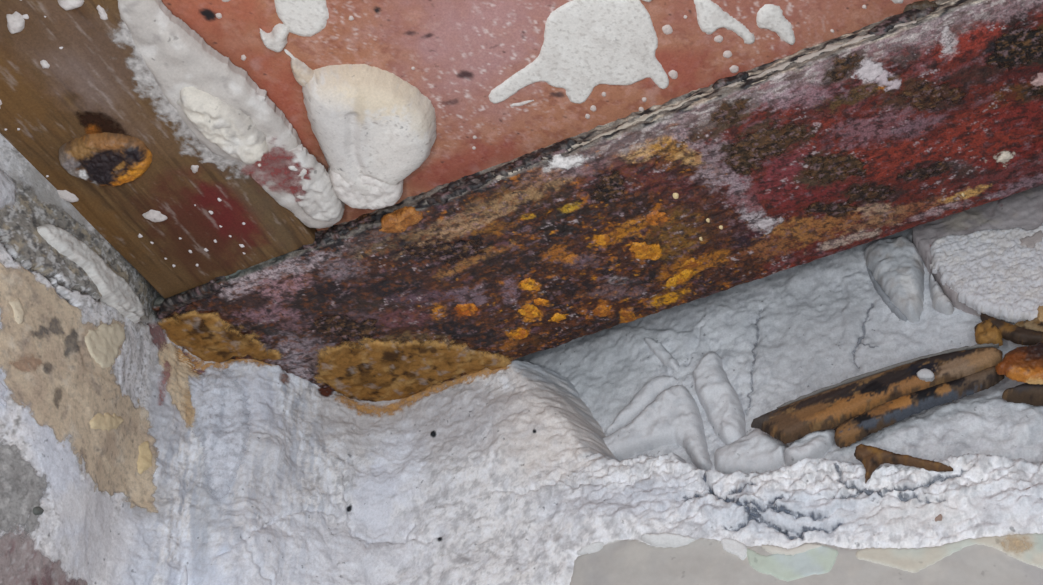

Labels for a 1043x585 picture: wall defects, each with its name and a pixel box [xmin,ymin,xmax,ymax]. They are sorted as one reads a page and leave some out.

rust [867,0,938,36]
rust [77,111,126,135]
damp [242,147,312,202]
rust [379,138,577,233]
rust [629,242,663,260]
spalling [0,178,159,513]
rust [156,276,281,427]
rust [314,338,511,416]
rust [508,278,566,340]
crack [747,310,762,408]
spalling [0,441,49,534]
peeling [570,533,1043,585]